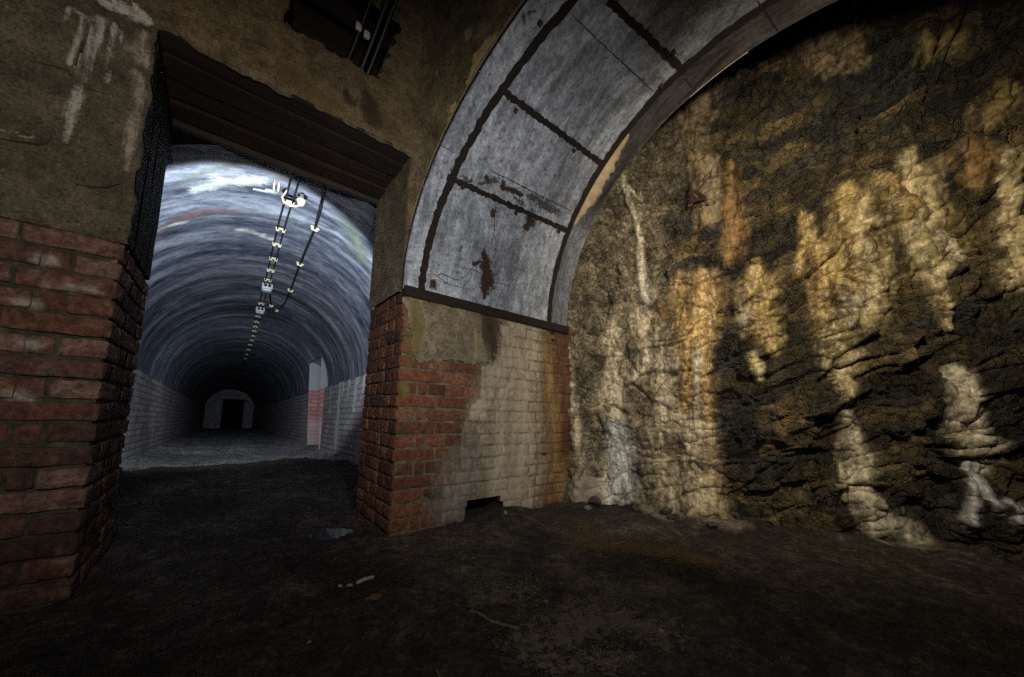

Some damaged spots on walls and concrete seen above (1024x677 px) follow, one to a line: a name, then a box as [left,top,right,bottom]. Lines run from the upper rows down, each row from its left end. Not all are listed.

damp [64,7,150,172]
corrosion [470,174,524,197]
corrosion [523,214,536,231]
peeling [402,296,499,365]
corrosion [472,249,495,299]
crack [887,247,1014,342]
damp [437,315,550,523]
corrosion [543,329,571,504]
crack [684,340,874,420]